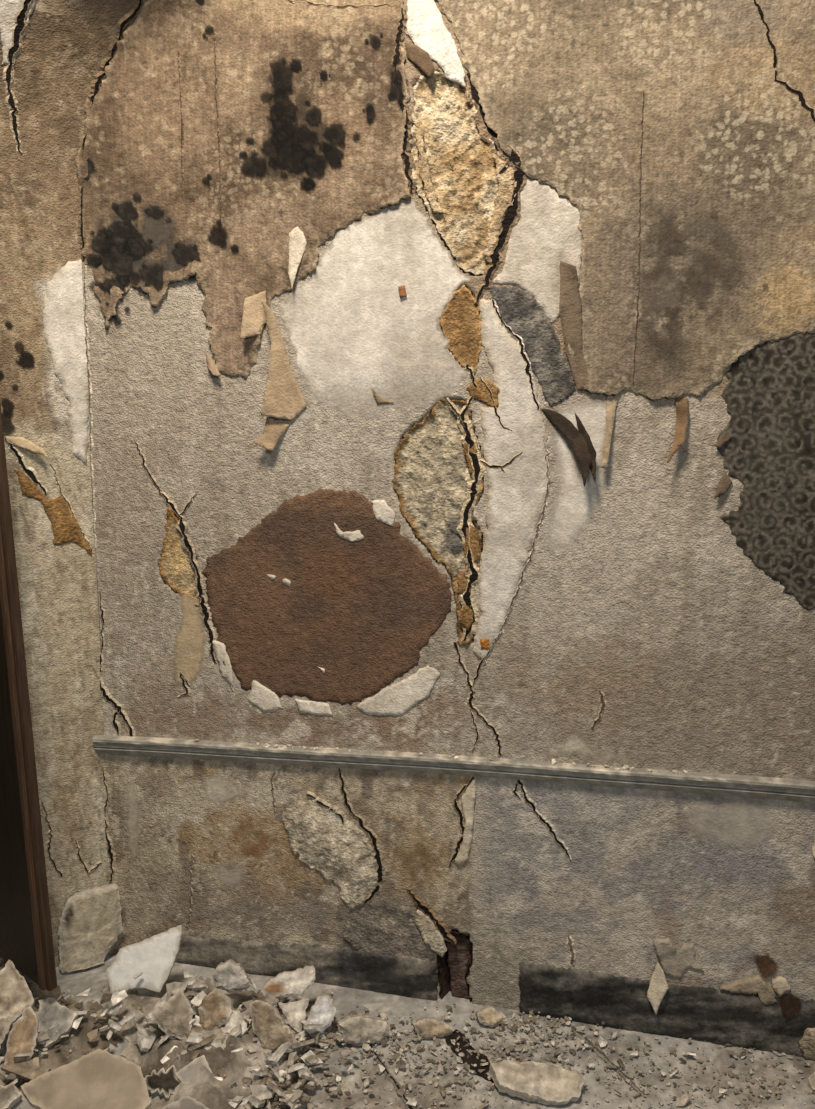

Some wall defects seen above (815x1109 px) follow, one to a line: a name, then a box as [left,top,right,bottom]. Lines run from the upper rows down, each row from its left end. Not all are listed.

mould [239,57,359,191]
mould [388,58,408,103]
crack [3,0,143,548]
mould [87,192,201,325]
mould [208,220,238,252]
crack [465,73,540,410]
flaking render [158,0,613,716]
peeling [5,436,49,458]
crack [445,364,551,867]
crack [307,768,457,945]
flaking render [342,898,473,1000]
spalling [445,1022,494,1083]